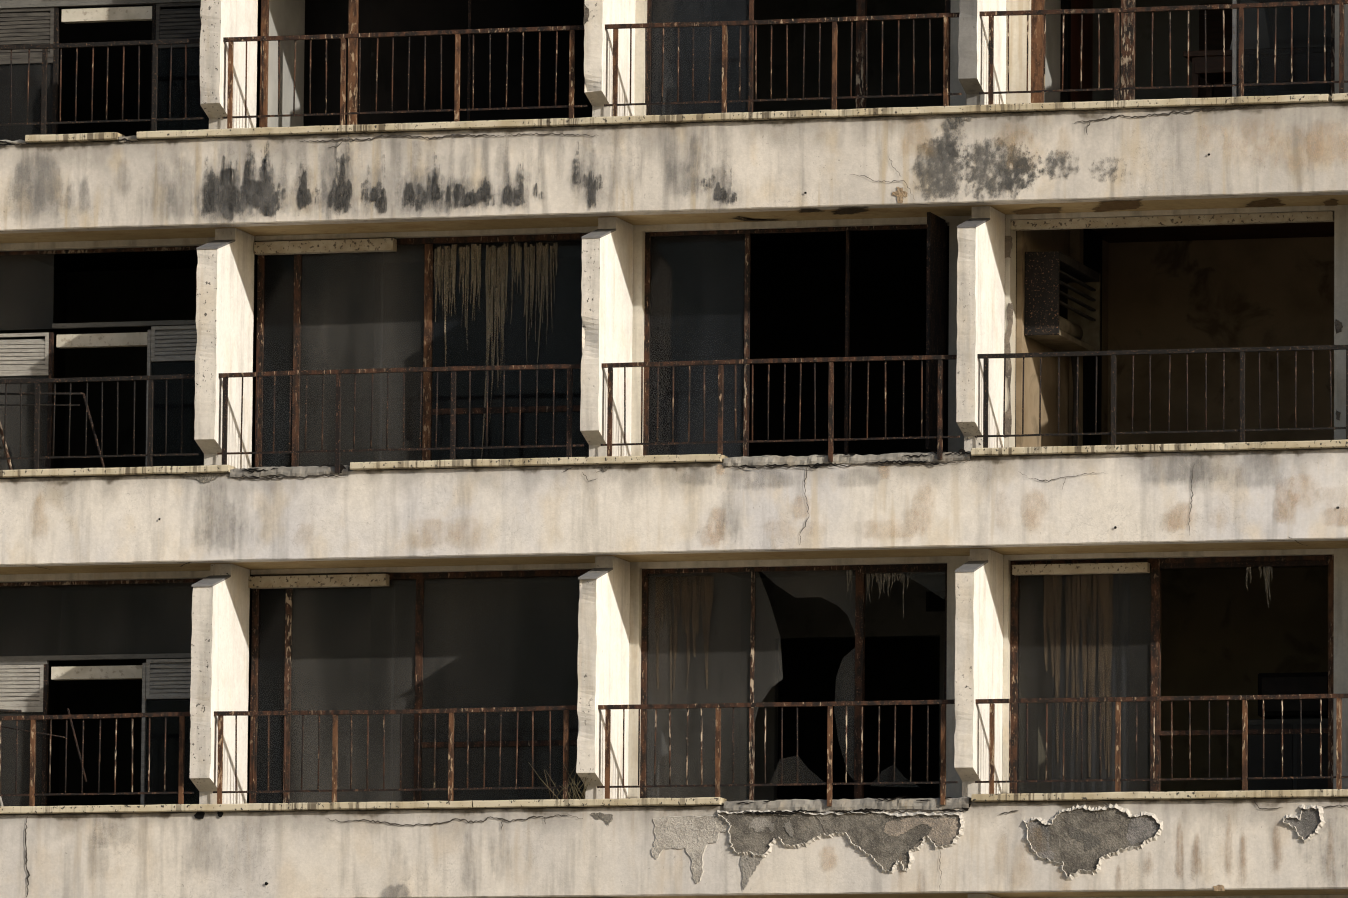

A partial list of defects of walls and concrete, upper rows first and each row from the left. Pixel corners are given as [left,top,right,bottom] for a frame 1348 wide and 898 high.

water stain [201,135,542,221]
water stain [573,143,602,208]
water stain [703,170,737,203]
water stain [913,115,1078,200]
crack [23,816,31,897]
spalling [652,796,970,890]
spalling [1023,803,1163,881]
spalling [1282,804,1326,844]